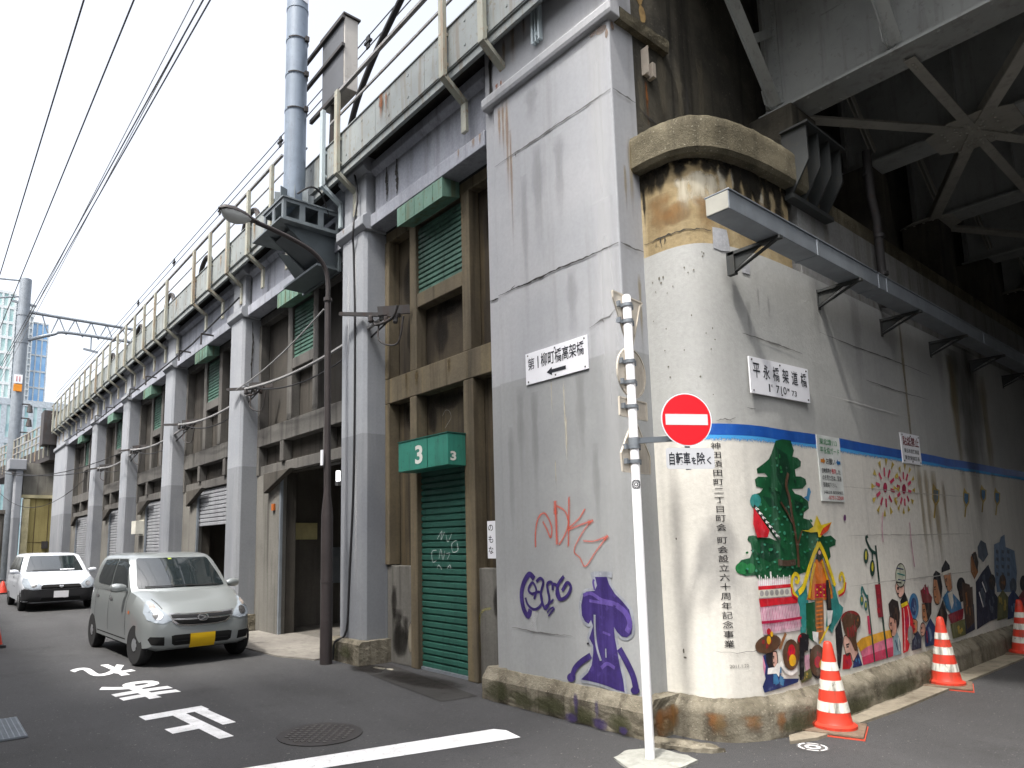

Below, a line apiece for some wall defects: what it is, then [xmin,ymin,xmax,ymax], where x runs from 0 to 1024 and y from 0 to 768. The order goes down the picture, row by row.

crack [495,88,657,167]
water stain [639,158,791,217]
crack [491,228,711,301]
water stain [392,589,407,654]